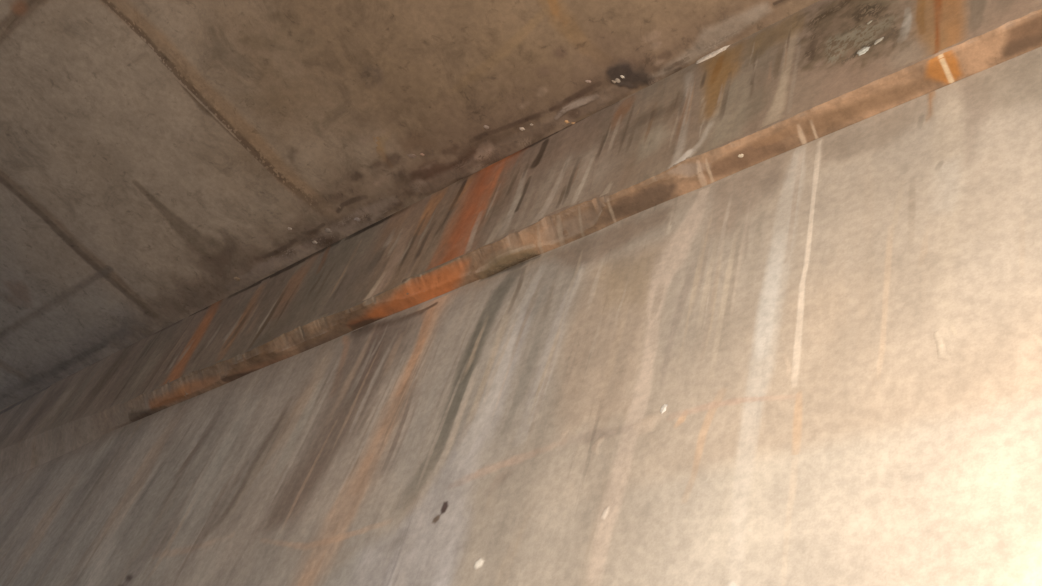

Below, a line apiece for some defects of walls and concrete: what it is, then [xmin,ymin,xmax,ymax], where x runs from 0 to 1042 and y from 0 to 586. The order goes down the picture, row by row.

damp [0,0,760,447]
corrosion [284,145,531,586]
damp [306,0,1042,586]
corrosion [912,0,971,86]